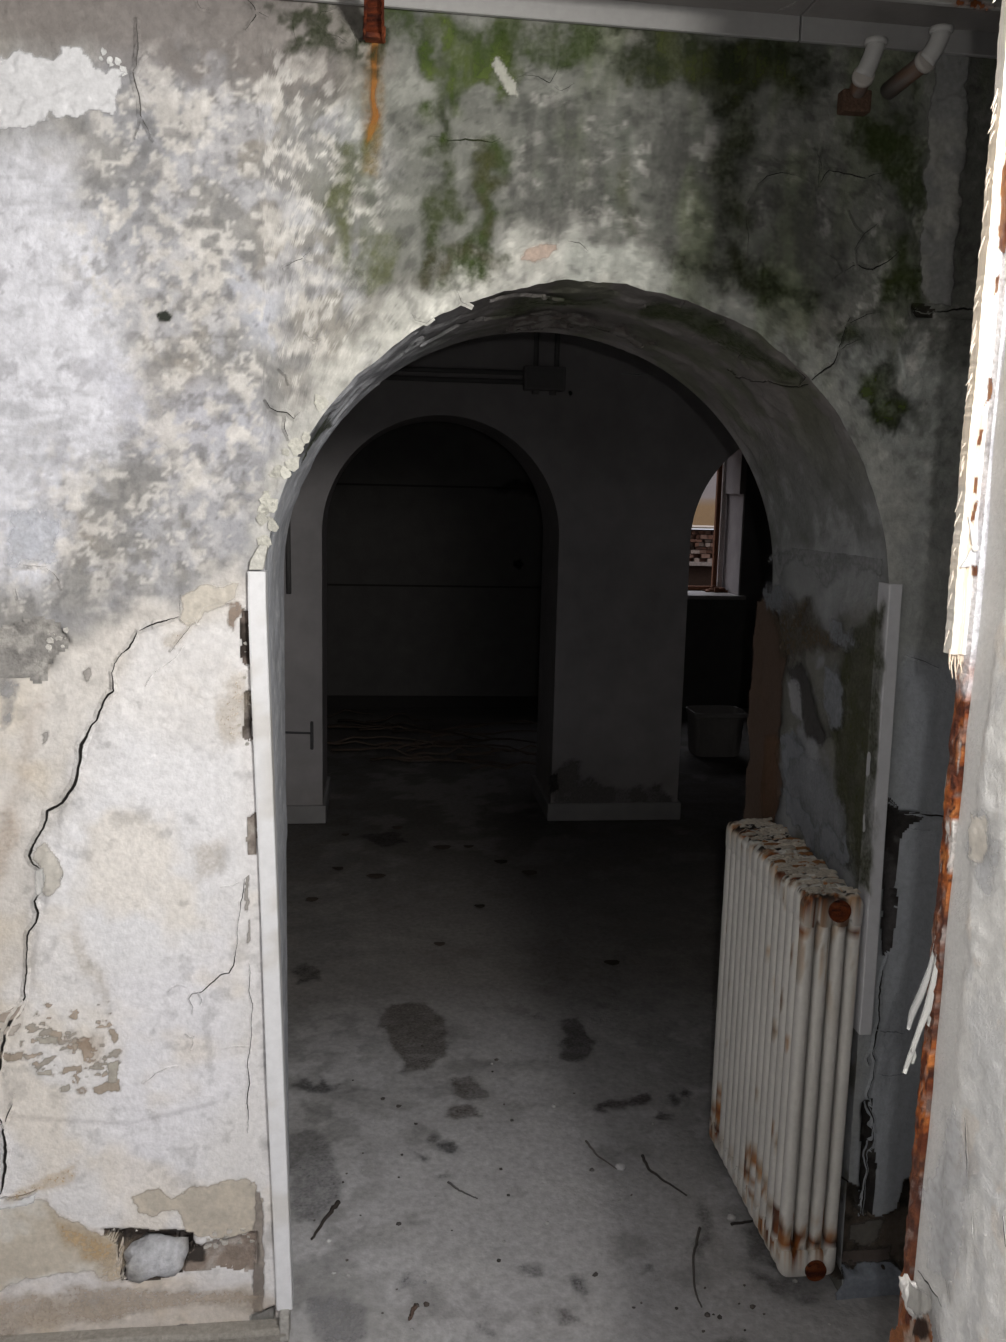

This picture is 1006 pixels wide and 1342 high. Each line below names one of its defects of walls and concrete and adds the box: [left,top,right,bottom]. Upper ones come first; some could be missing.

peeling [0,46,127,129]
corrosion [366,43,379,154]
damp [384,8,415,36]
damp [513,19,596,67]
damp [420,111,510,286]
peeling [743,586,850,866]
crack [0,593,229,1200]
flaking render [880,798,924,956]
peeling [0,1003,122,1094]
peeling [0,1179,277,1320]
corrosion [889,1313,933,1342]